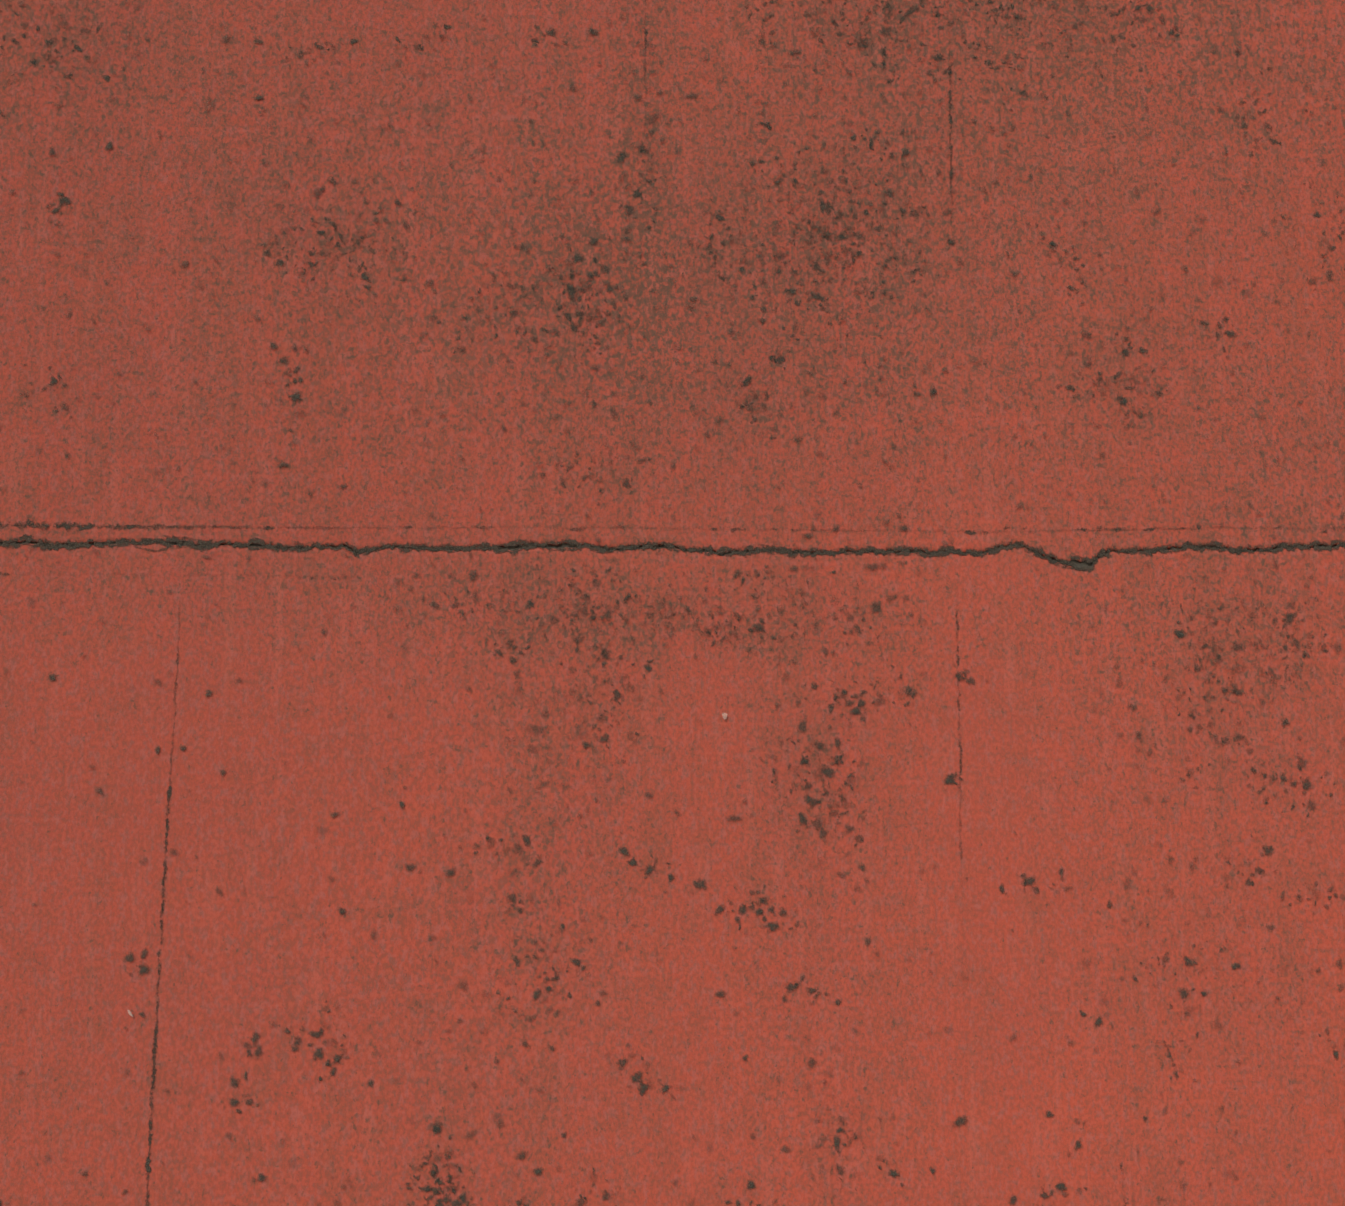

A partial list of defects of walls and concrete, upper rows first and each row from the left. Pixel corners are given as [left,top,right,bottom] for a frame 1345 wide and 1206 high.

crack [0,519,1345,579]